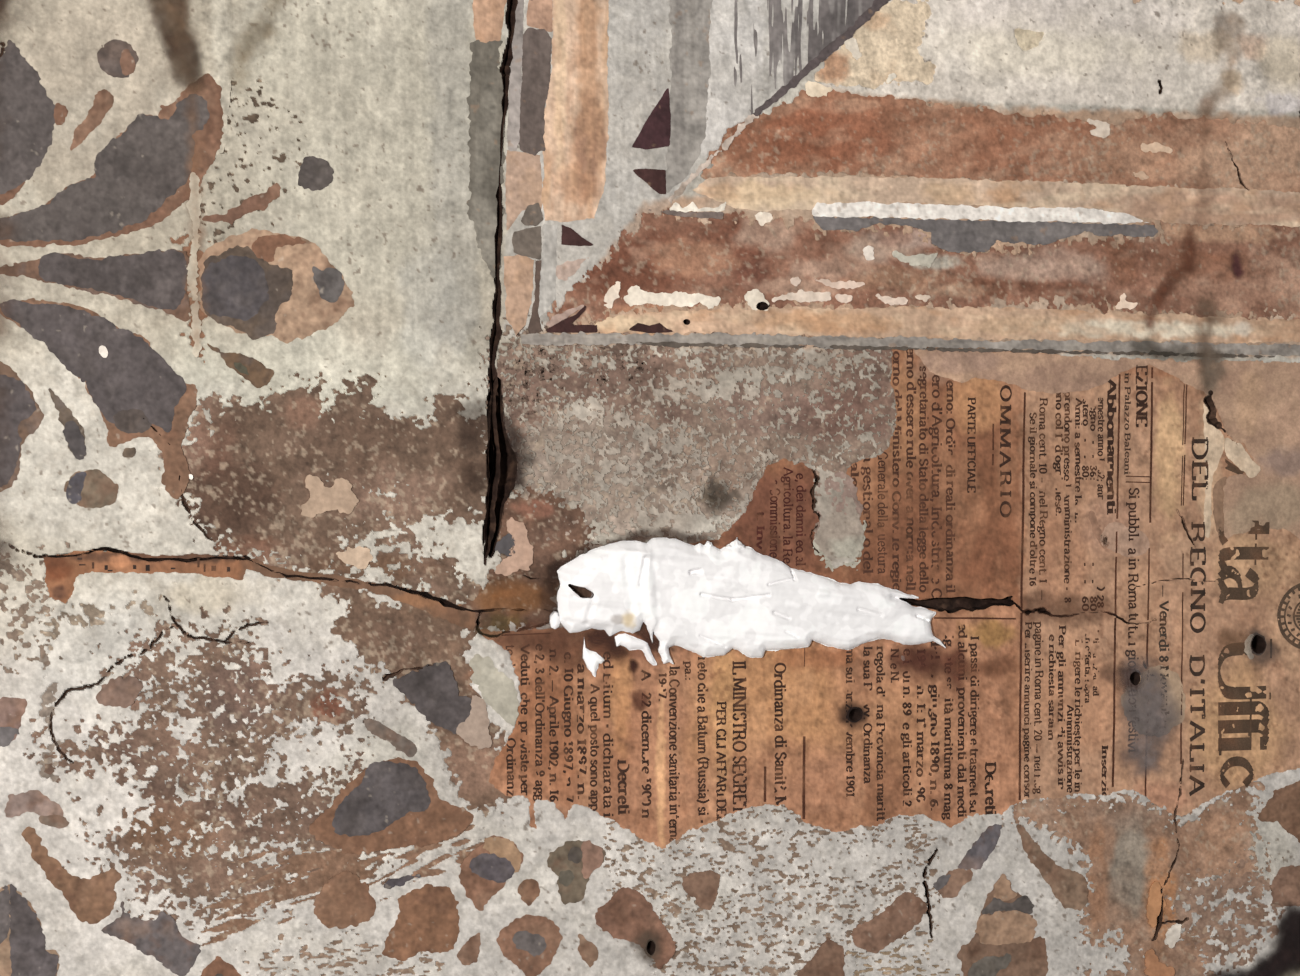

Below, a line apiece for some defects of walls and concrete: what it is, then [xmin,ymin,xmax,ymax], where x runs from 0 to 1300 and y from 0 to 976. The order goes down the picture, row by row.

peeling [521,203,543,226]
crack [9,0,557,638]
crack [49,596,269,763]
peeling [0,208,1300,976]
crack [899,596,1157,625]
crack [923,849,938,938]
crack [1152,759,1184,941]
damp [1217,906,1300,976]